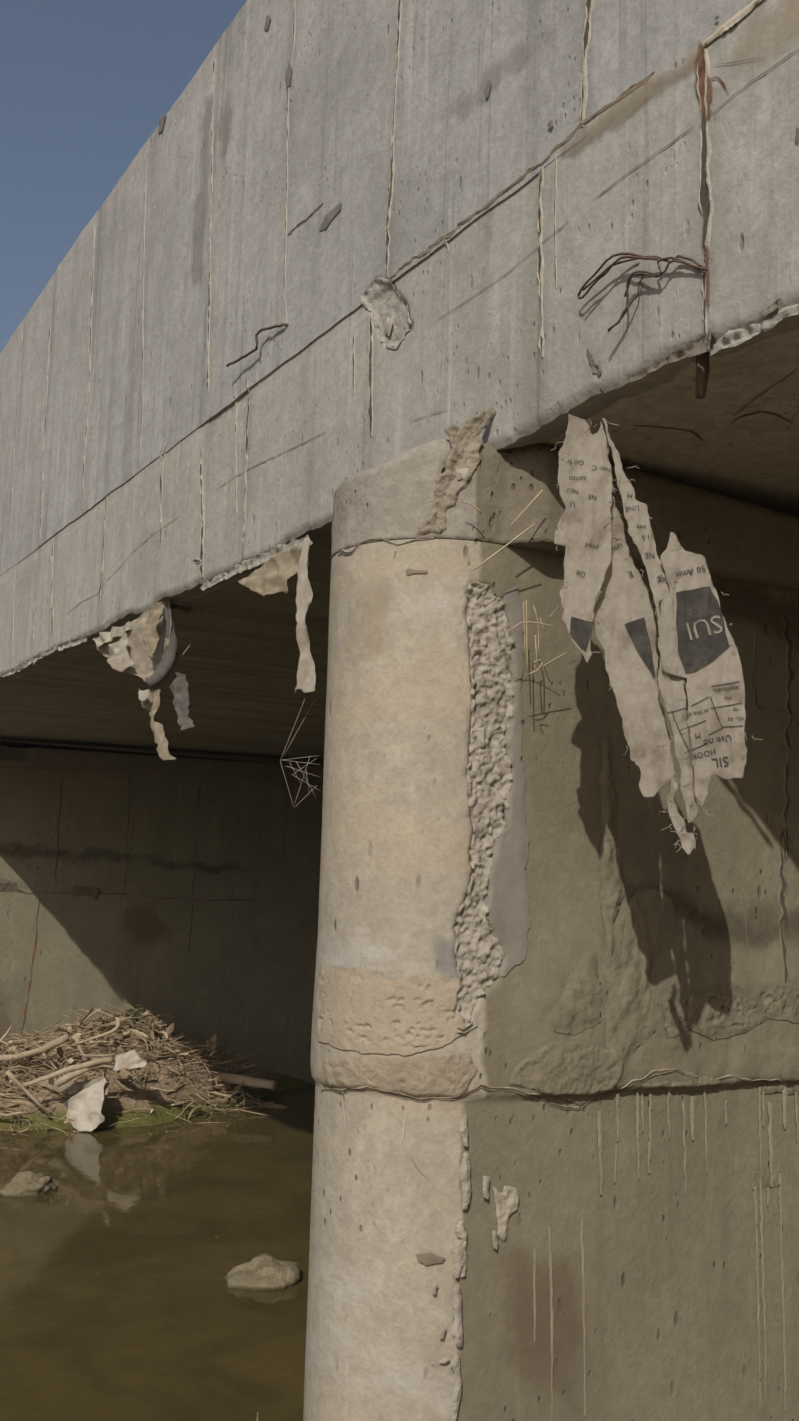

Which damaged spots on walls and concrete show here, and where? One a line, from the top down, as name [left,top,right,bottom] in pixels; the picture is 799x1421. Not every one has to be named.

crack [385,0,654,358]
crack [594,46,799,335]
rust [695,44,712,120]
crack [10,58,325,658]
spalling [201,535,313,591]
crack [352,311,374,437]
spalling [416,407,497,535]
peeling [412,581,530,1047]
peeling [416,1112,519,1421]
damp [533,1226,554,1421]
damp [597,1076,727,1195]
damp [750,1081,799,1411]